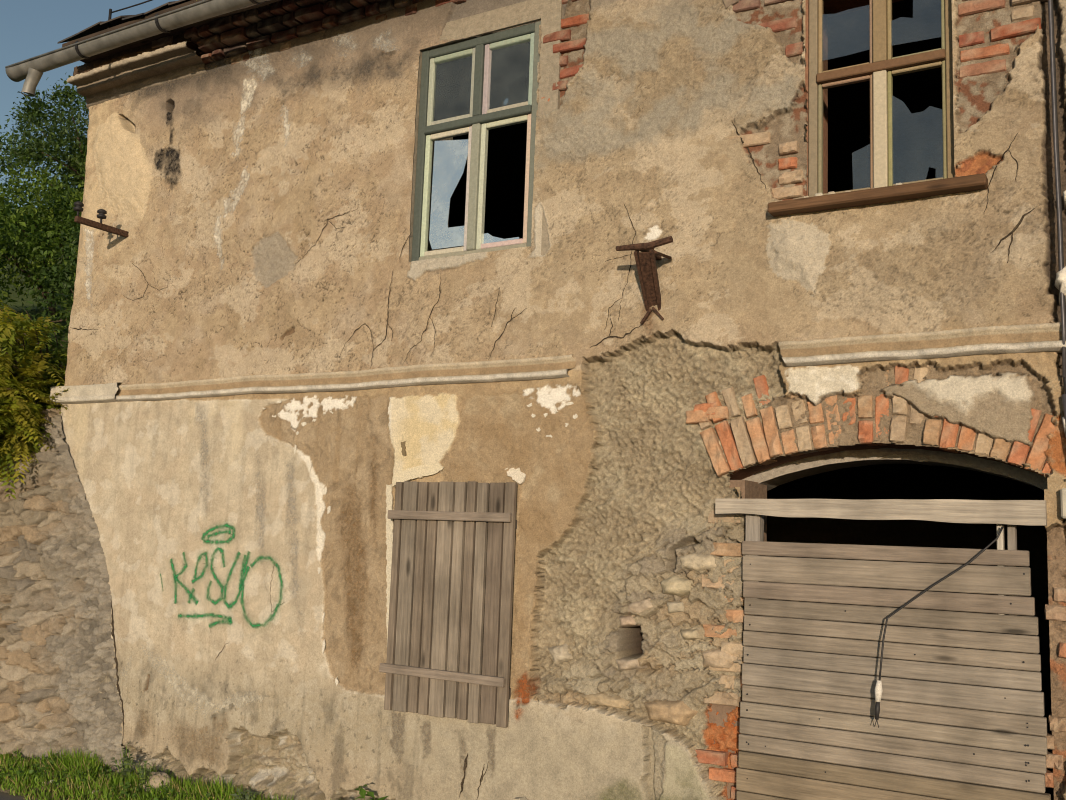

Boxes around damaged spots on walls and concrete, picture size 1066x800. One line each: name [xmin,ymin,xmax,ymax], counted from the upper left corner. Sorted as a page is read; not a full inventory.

flaking render [539,0,591,105]
flaking render [729,0,805,65]
flaking render [955,0,1048,133]
flaking render [729,82,807,201]
flaking render [955,149,1004,177]
crack [339,232,441,362]
crack [488,287,525,360]
flaking render [260,329,1066,800]
spalling [123,726,396,800]
crack [459,753,489,798]